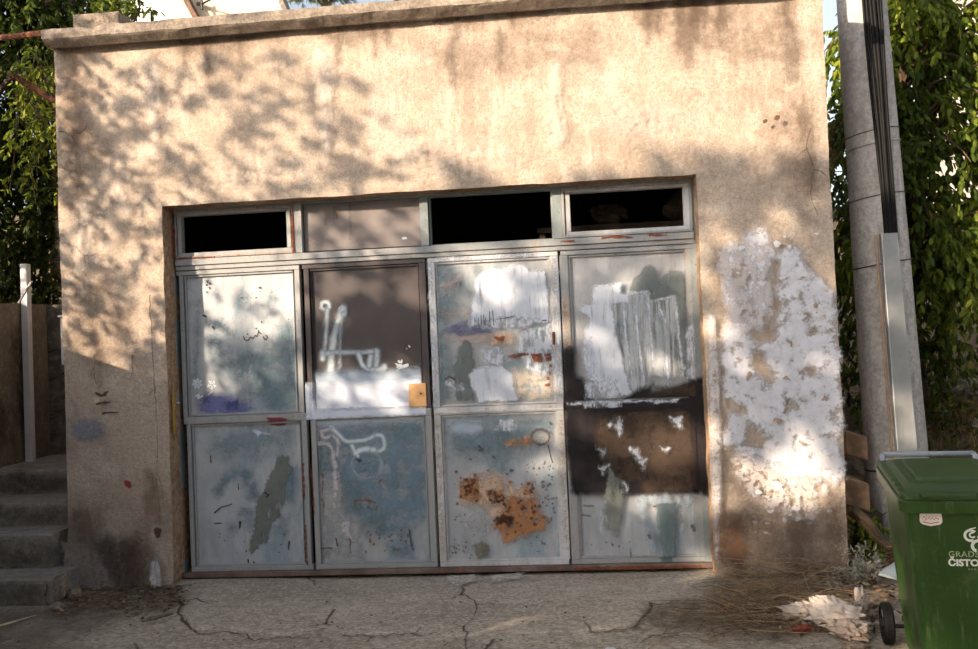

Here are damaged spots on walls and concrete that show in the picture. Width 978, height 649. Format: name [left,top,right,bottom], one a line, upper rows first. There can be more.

peeling [718,227,845,534]
rust [454,469,551,543]
damp [93,538,136,590]
crack [169,593,434,642]
crack [453,587,534,649]
crack [584,602,698,633]